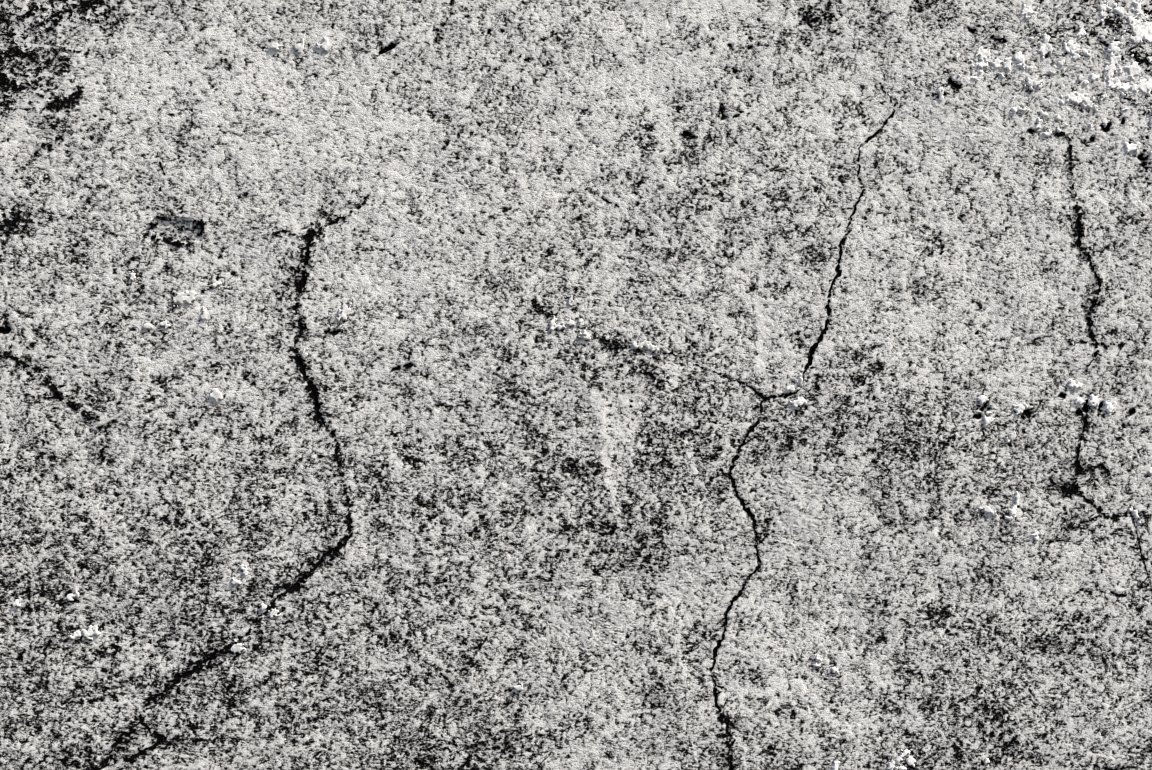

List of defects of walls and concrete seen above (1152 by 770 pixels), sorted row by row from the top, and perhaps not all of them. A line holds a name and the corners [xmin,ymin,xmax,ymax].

crack [0,350,116,468]
crack [90,189,369,770]
crack [531,82,896,770]
crack [1046,131,1152,598]
crack [1093,762,1134,770]